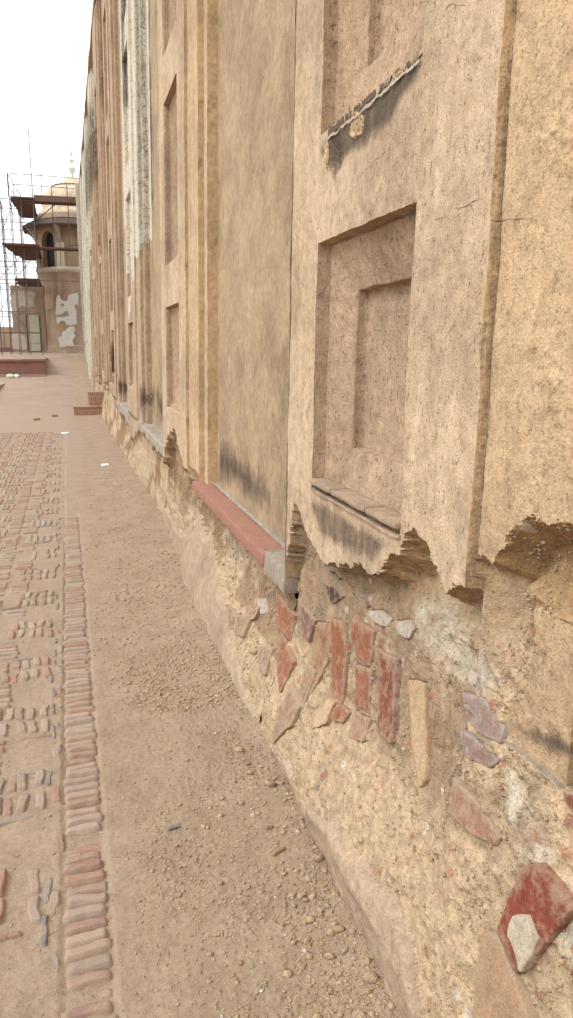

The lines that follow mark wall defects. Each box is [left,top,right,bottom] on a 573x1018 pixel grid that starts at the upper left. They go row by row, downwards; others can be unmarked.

flaking render [44,293,79,347]
peeling [80,66,97,379]
peeling [350,111,364,139]
spalling [93,372,573,1018]